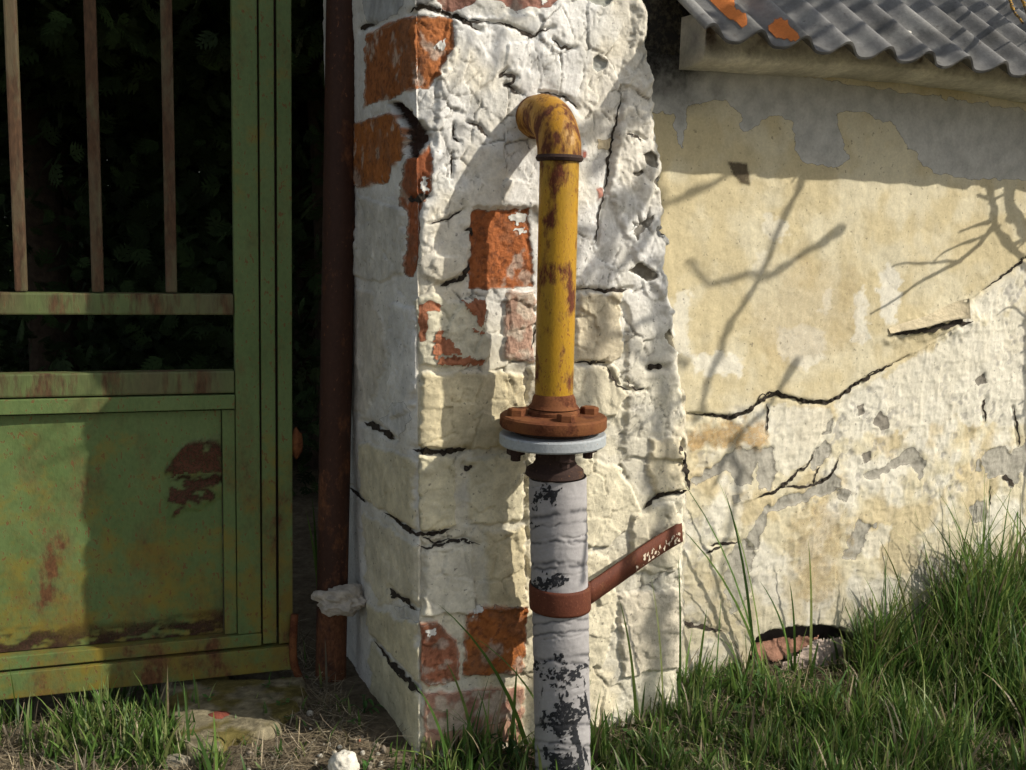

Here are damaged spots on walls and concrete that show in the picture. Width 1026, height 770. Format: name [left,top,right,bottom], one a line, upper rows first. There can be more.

spalling [498,0,557,11]
spalling [353,0,476,277]
spalling [461,208,535,362]
spalling [418,300,485,367]
crack [692,319,973,430]
peeling [857,404,890,430]
rust [166,440,222,515]
peeling [862,447,926,480]
peeling [690,418,851,614]
rust [0,612,223,652]
spalling [420,604,529,735]
spalling [750,635,851,672]